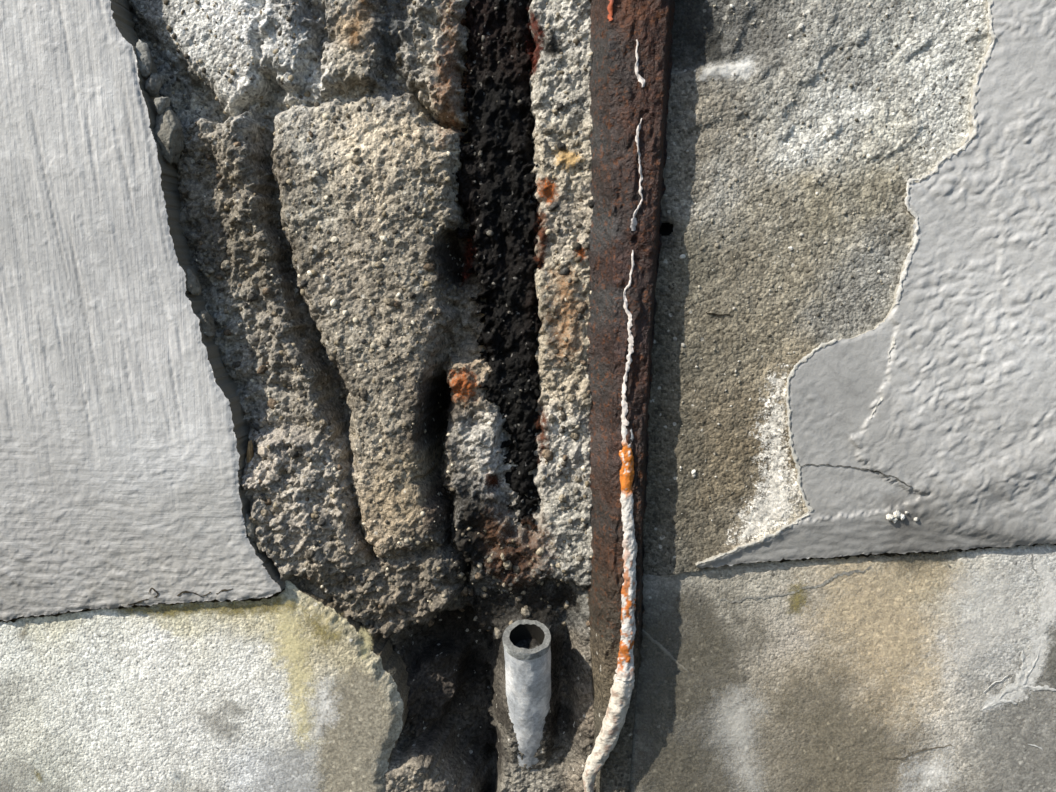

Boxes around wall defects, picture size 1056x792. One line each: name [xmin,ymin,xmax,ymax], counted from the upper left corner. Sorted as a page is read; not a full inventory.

peeling [630,118,643,231]
spalling [128,0,596,792]
rust [435,0,556,535]
peeling [621,250,635,426]
leakage [726,365,804,546]
peeling [642,0,996,578]
crack [794,464,912,487]
crack [719,543,1056,603]
leakage [252,666,396,792]
leakage [632,602,759,792]
leakage [978,558,1056,792]
crack [982,621,1056,711]